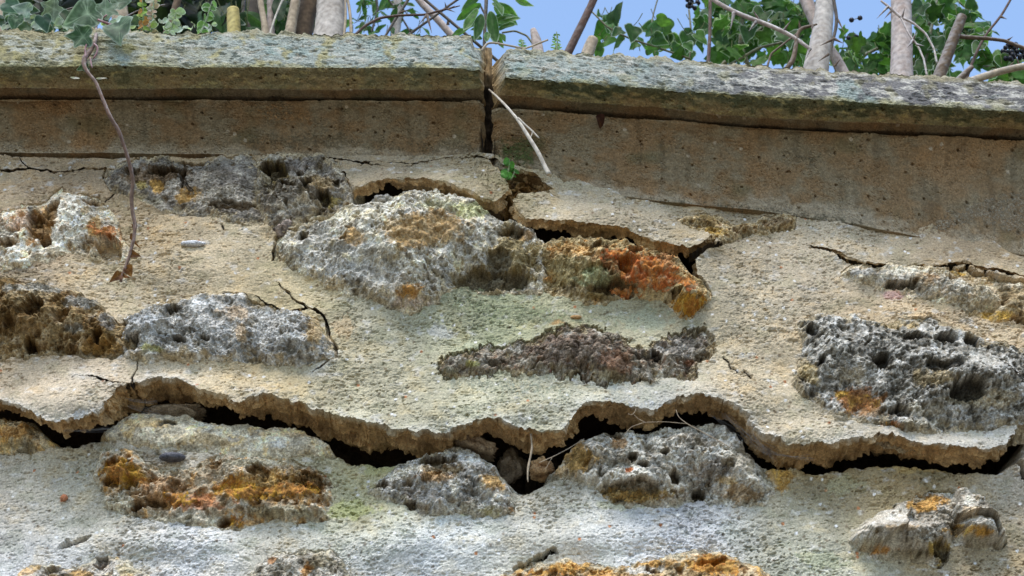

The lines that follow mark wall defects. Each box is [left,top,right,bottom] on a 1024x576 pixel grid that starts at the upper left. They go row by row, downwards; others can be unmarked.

crack [475,47,495,165]
crack [1,159,52,173]
peeling [272,219,293,238]
crack [811,247,883,268]
crack [934,264,1014,275]
crack [258,252,338,369]
crack [89,376,135,390]
crack [52,440,101,449]
crack [204,420,407,468]
peeling [0,364,1015,485]
crack [485,423,703,495]
crack [736,434,1024,480]